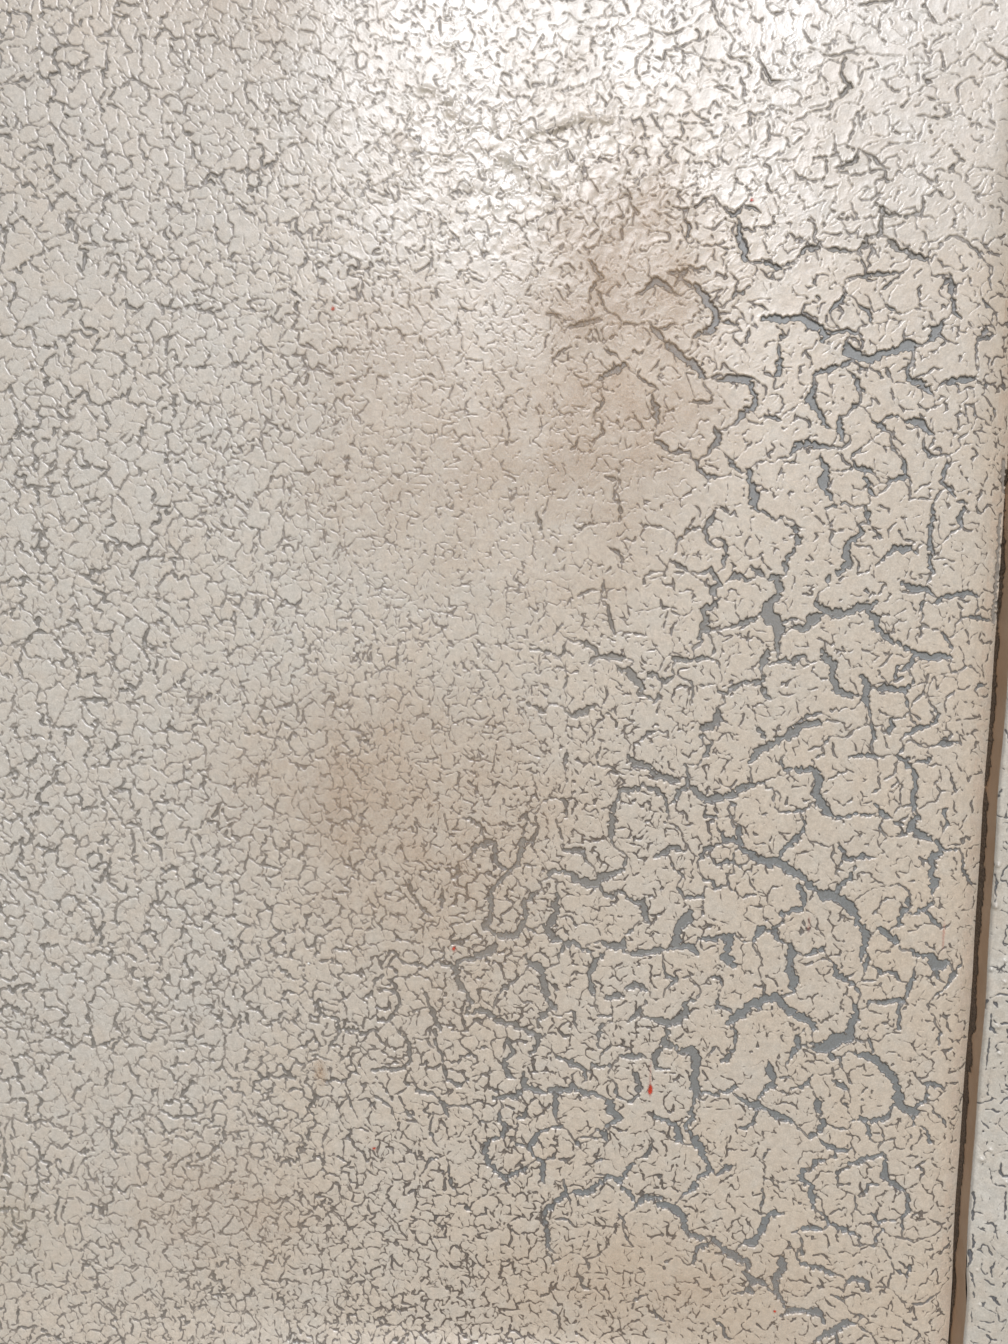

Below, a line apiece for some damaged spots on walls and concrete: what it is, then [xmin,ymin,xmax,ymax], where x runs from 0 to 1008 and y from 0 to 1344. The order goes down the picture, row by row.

crack [720,204,763,219]
crack [734,216,753,264]
crack [747,213,823,273]
crack [915,260,965,321]
crack [652,438,694,458]
crack [814,425,919,523]
crack [859,404,902,434]
crack [899,330,1008,522]
crack [700,510,731,574]
crack [924,520,1001,635]
crack [697,695,728,747]
crack [855,1193,913,1245]